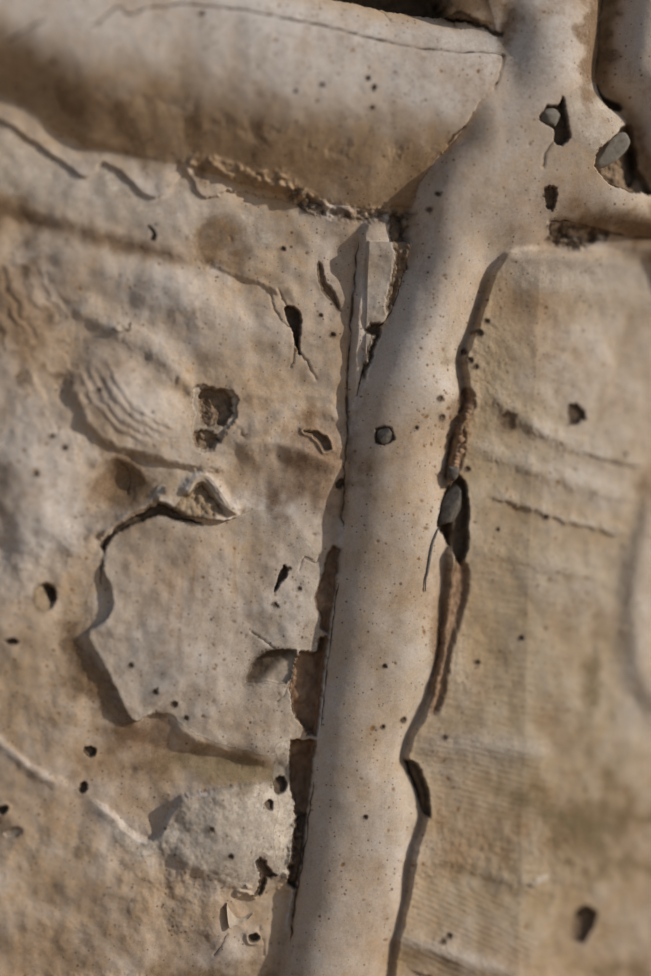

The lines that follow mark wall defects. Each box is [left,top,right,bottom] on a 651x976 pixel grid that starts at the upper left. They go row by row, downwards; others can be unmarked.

crack [89,3,504,85]
spalling [549,222,608,250]
crack [340,243,402,527]
leakage [93,458,147,503]
peeling [88,475,340,897]